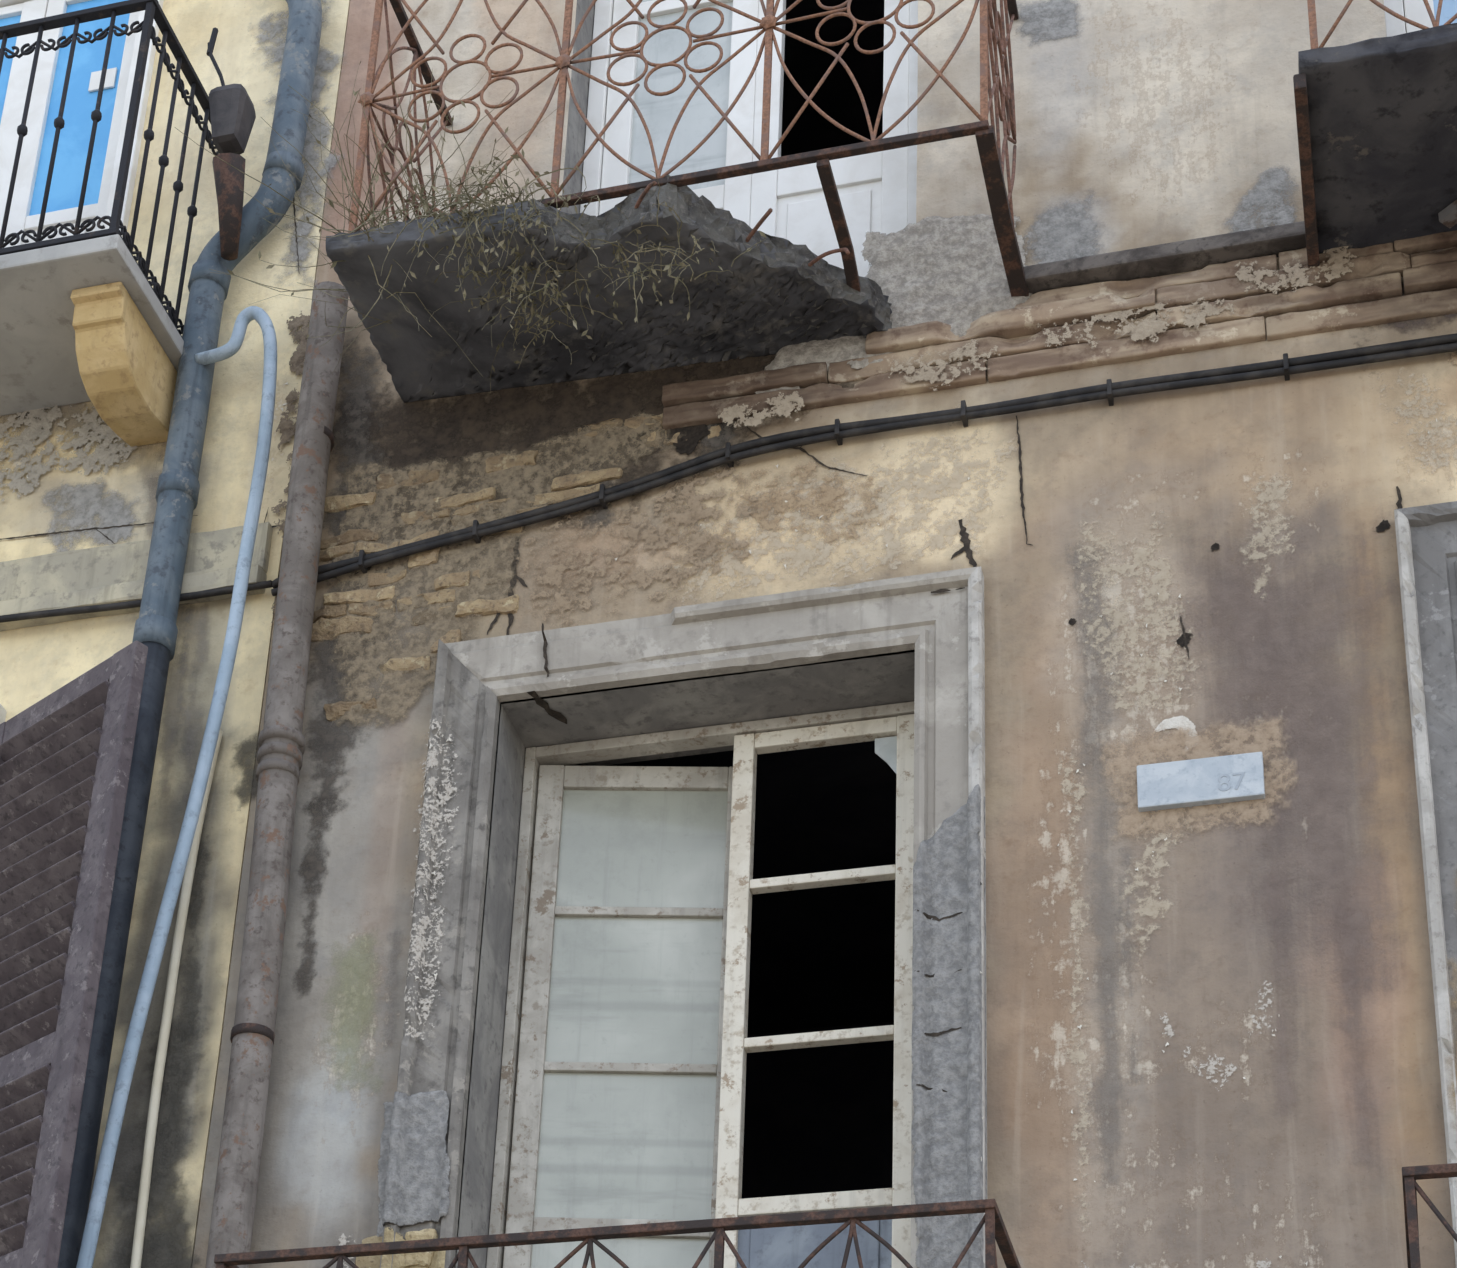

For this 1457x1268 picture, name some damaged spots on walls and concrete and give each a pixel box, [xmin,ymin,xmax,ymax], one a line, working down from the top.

spalling [861,214,1032,337]
spalling [765,336,895,371]
spalling [0,404,137,552]
damp [325,338,777,540]
crack [1016,415,1032,545]
flaking render [311,413,1014,726]
crack [931,519,977,593]
damp [296,634,364,993]
peeling [404,715,460,1040]
damp [1101,719,1296,836]
spalling [911,784,987,1268]
flaking render [338,1227,446,1268]